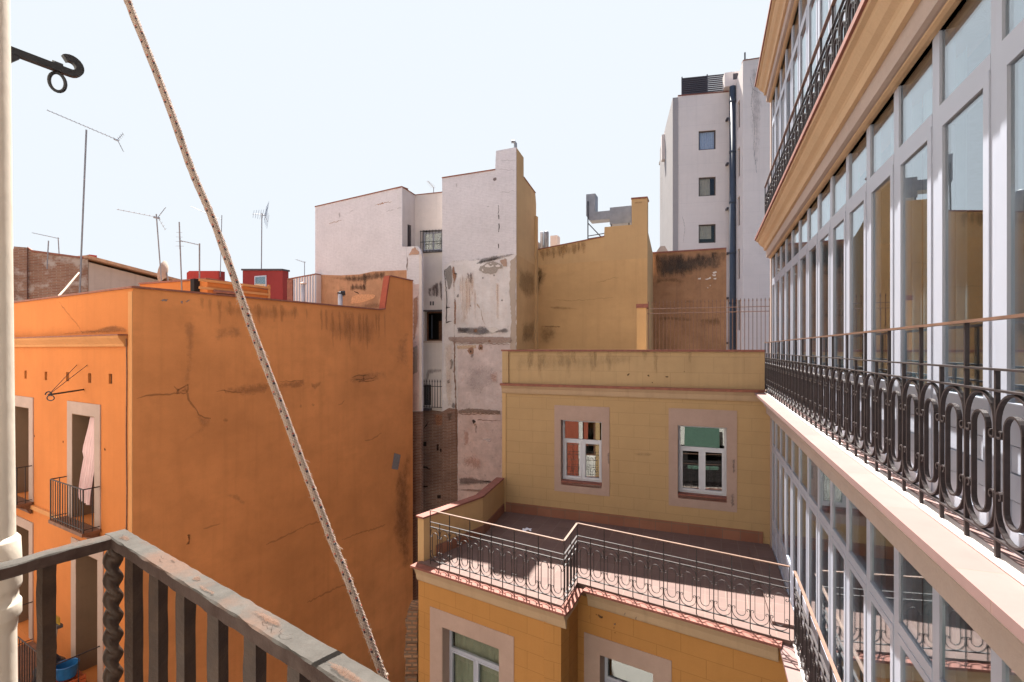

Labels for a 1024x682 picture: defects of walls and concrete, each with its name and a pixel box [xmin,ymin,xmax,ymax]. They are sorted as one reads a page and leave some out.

flaking render [413,254,517,600]